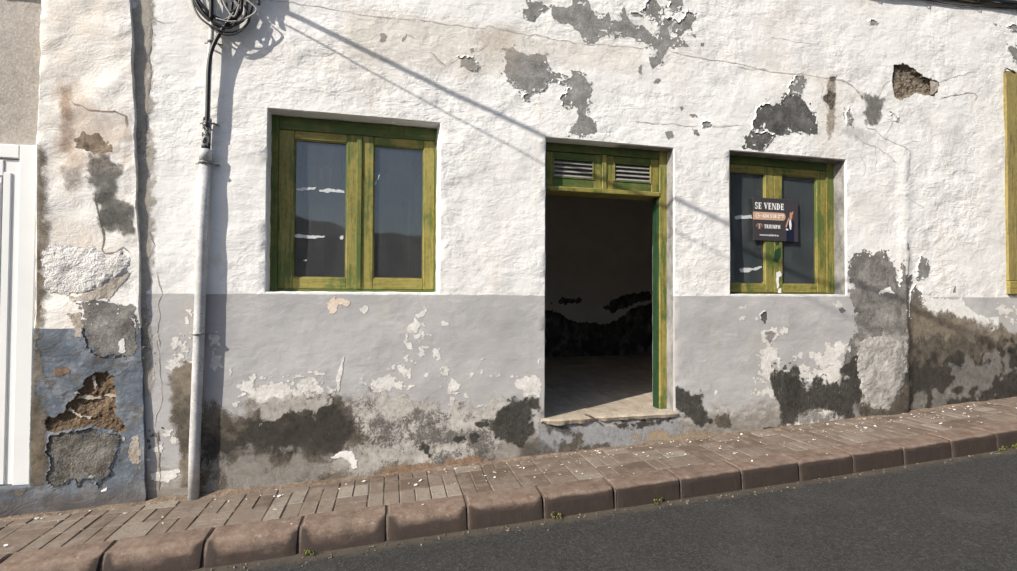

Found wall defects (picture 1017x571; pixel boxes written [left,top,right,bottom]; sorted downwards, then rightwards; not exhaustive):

spalling [74,131,113,154]
peeling [500,44,597,138]
peeling [519,0,704,84]
peeling [742,74,818,152]
spalling [892,63,939,101]
peeling [993,22,1017,64]
peeling [10,145,180,495]
peeling [208,331,336,408]
water stain [168,358,731,493]
water stain [763,354,864,429]
peeling [739,243,1017,399]
water stain [892,297,1017,413]